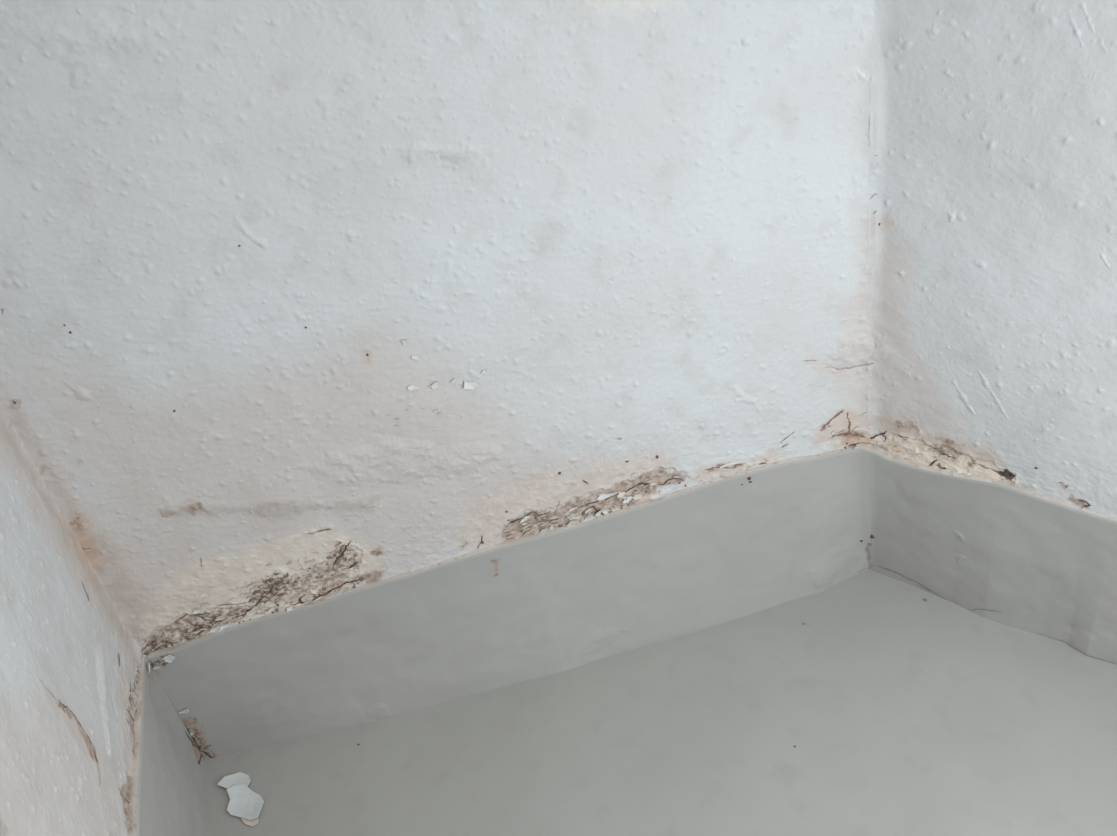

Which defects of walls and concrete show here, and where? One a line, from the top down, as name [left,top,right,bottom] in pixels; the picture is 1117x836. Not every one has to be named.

peeling [137,520,395,657]
water stain [0,261,621,836]
peeling [450,434,696,556]
peeling [869,413,1030,487]